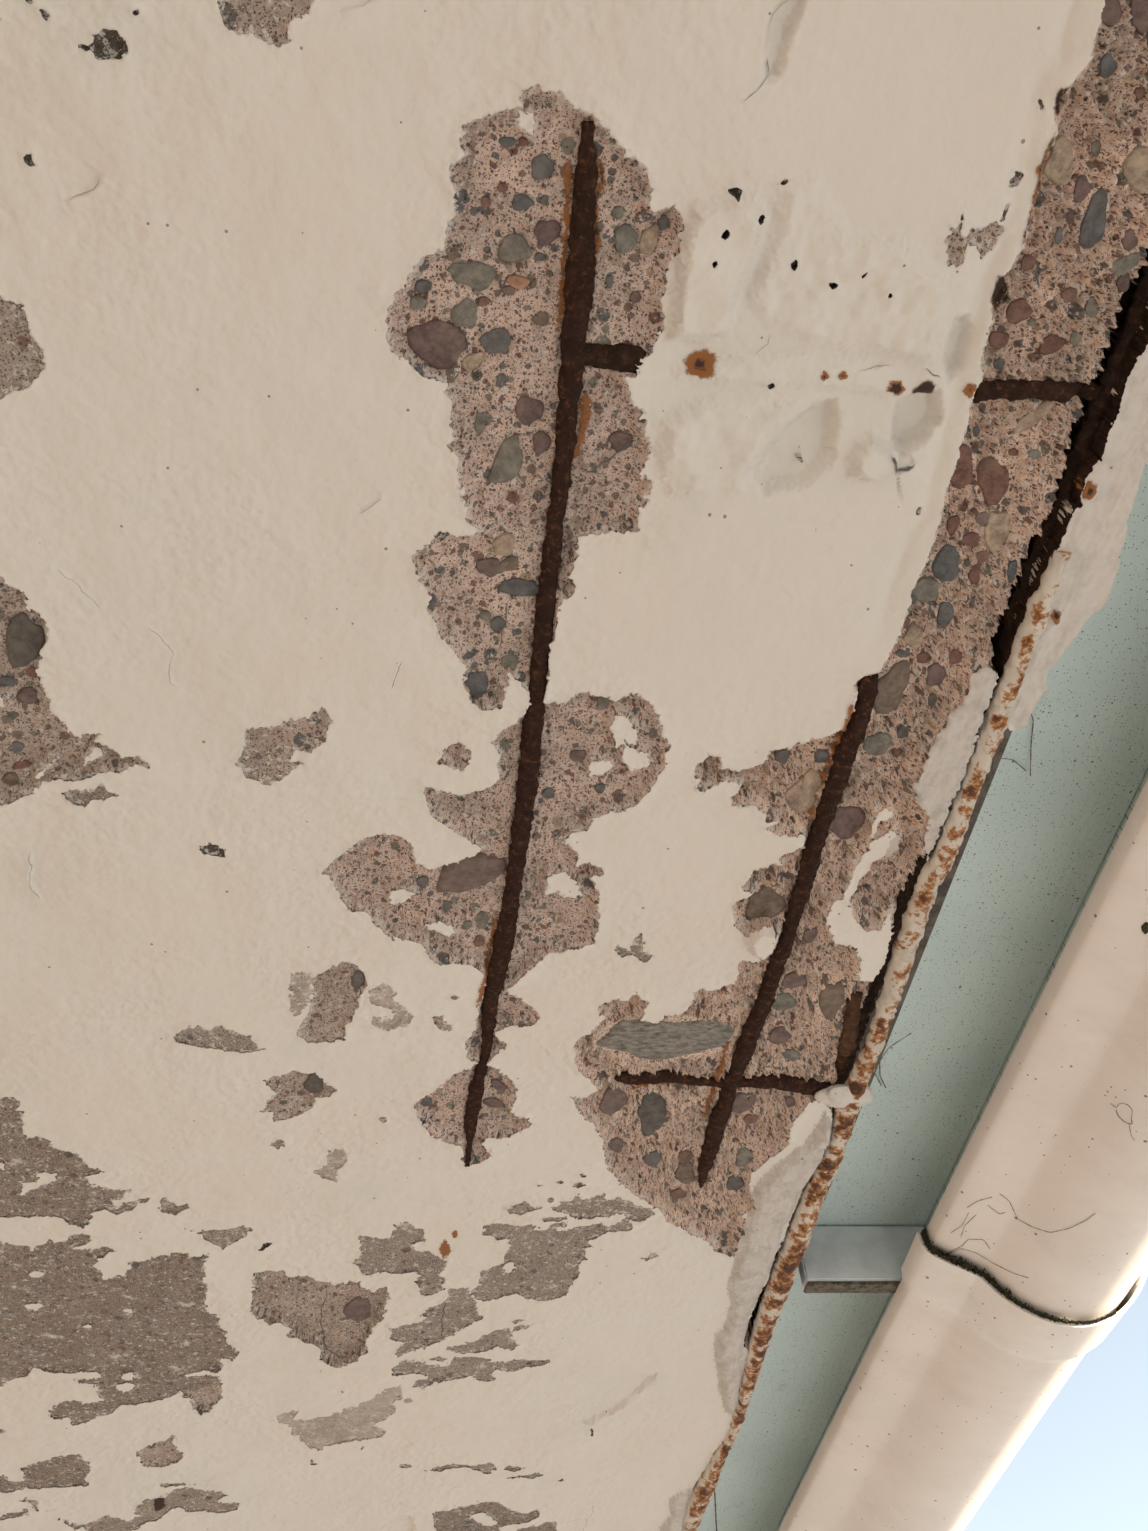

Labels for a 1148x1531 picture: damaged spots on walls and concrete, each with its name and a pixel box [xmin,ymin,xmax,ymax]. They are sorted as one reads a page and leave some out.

peeling [217,0,314,47]
corrosion [1023,88,1068,244]
peeling [0,295,45,400]
corrosion [685,349,716,379]
corrosion [992,275,1009,311]
corrosion [963,379,1102,403]
spalling [0,576,150,807]
corrosion [463,121,646,1167]
spalling [235,0,1148,1465]
corrosion [614,674,879,1188]
peeling [0,1097,272,1426]
peeling [58,1435,239,1531]